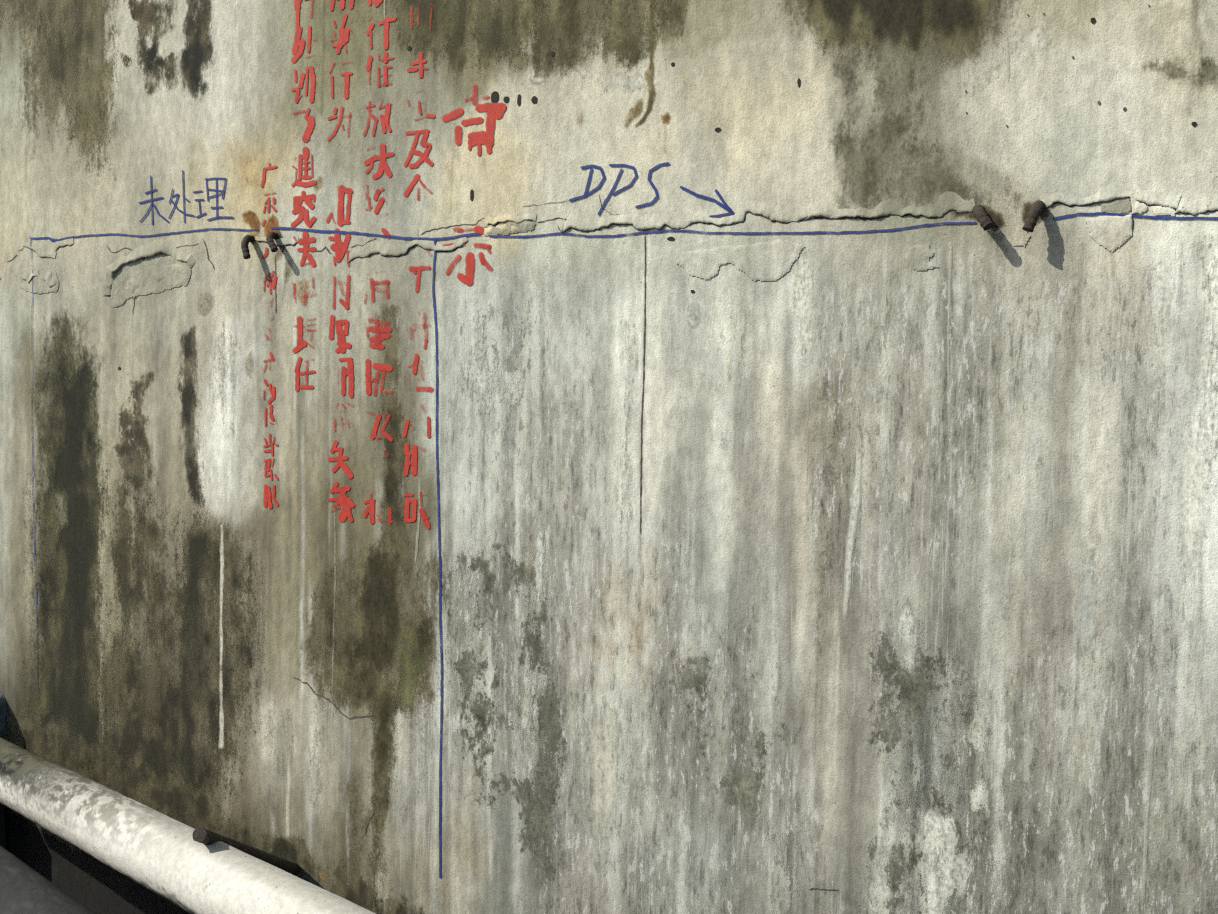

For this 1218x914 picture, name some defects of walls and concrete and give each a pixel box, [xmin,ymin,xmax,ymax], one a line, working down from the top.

water stain [0,0,213,171]
water stain [394,0,688,92]
corrosion [625,0,670,126]
water stain [785,0,1047,217]
crack [0,236,74,279]
spalling [102,238,195,315]
corrosion [243,211,307,305]
crack [255,218,484,312]
corrosion [955,205,1004,240]
crack [1040,185,1218,232]
spalling [1101,198,1176,216]
water stain [2,305,569,914]